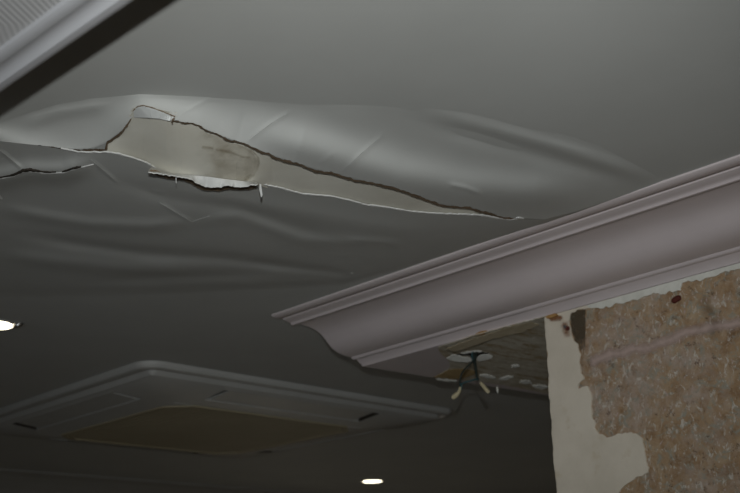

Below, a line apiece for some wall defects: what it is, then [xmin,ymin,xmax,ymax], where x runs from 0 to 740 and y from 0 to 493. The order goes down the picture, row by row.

flaking render [434,315,549,394]
peeling [569,269,740,493]